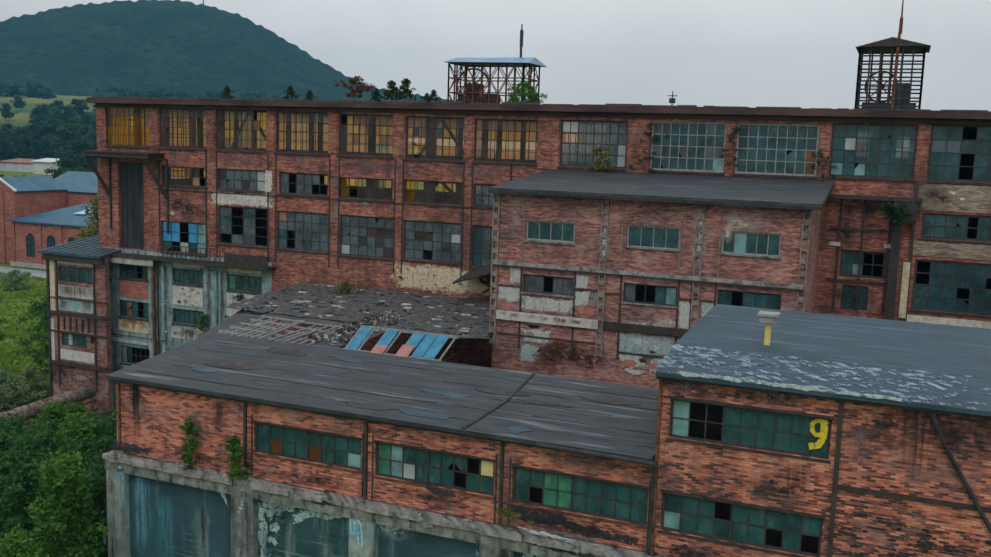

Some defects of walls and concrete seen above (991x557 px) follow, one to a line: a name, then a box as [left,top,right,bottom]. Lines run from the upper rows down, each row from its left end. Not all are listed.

flaking render [383,263,600,316]
flaking render [519,328,551,362]
peeling [615,293,991,410]
peeling [219,484,341,557]
spalling [507,504,643,557]